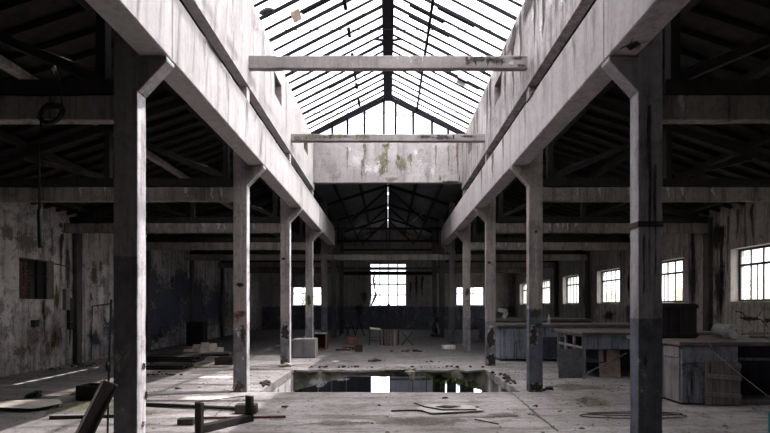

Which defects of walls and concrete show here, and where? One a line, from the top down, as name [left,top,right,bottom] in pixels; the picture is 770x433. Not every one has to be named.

damp [531,0,566,38]
damp [501,14,522,96]
damp [347,135,387,179]
flaking render [0,223,38,255]
damp [719,210,740,307]
flaking render [0,280,50,361]
spalling [235,324,247,346]
spalling [486,325,496,366]